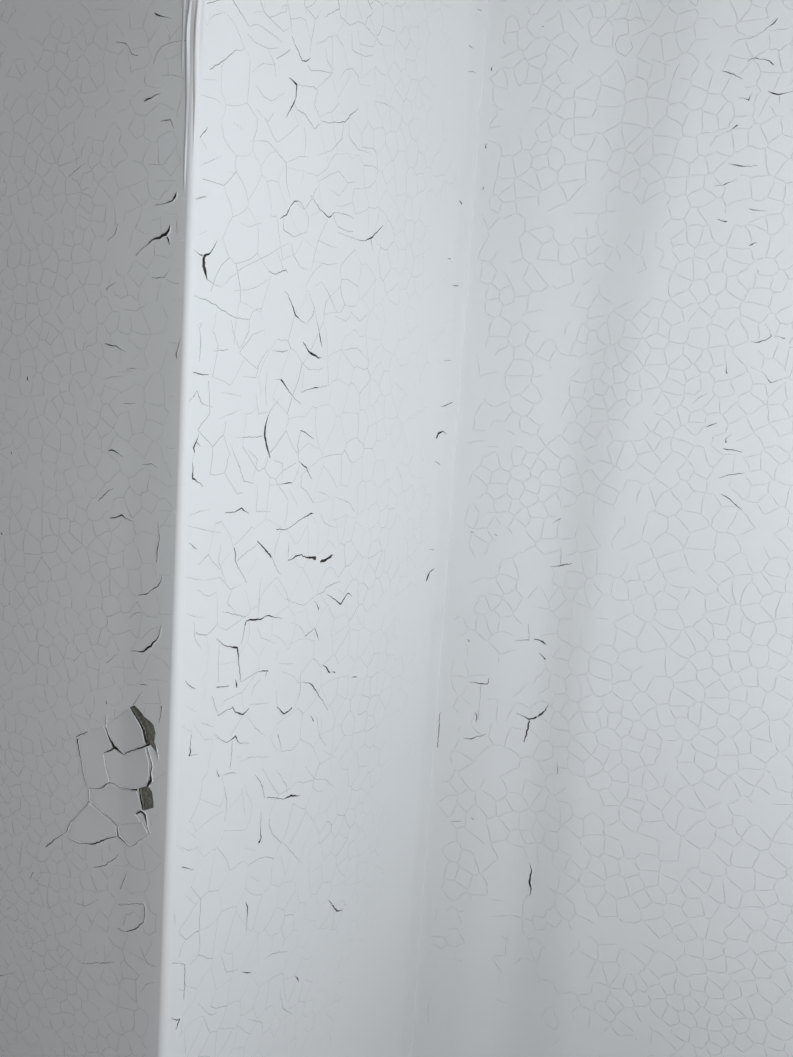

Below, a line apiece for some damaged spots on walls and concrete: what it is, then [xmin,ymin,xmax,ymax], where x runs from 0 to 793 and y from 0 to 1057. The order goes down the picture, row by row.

crack [116,12,186,64]
crack [144,92,175,128]
crack [136,191,178,256]
crack [103,343,136,380]
crack [108,448,157,467]
crack [98,488,134,522]
crack [159,0,793,1057]
crack [106,523,163,663]
peeling [66,707,159,847]
crack [46,832,67,847]
crack [94,853,146,933]